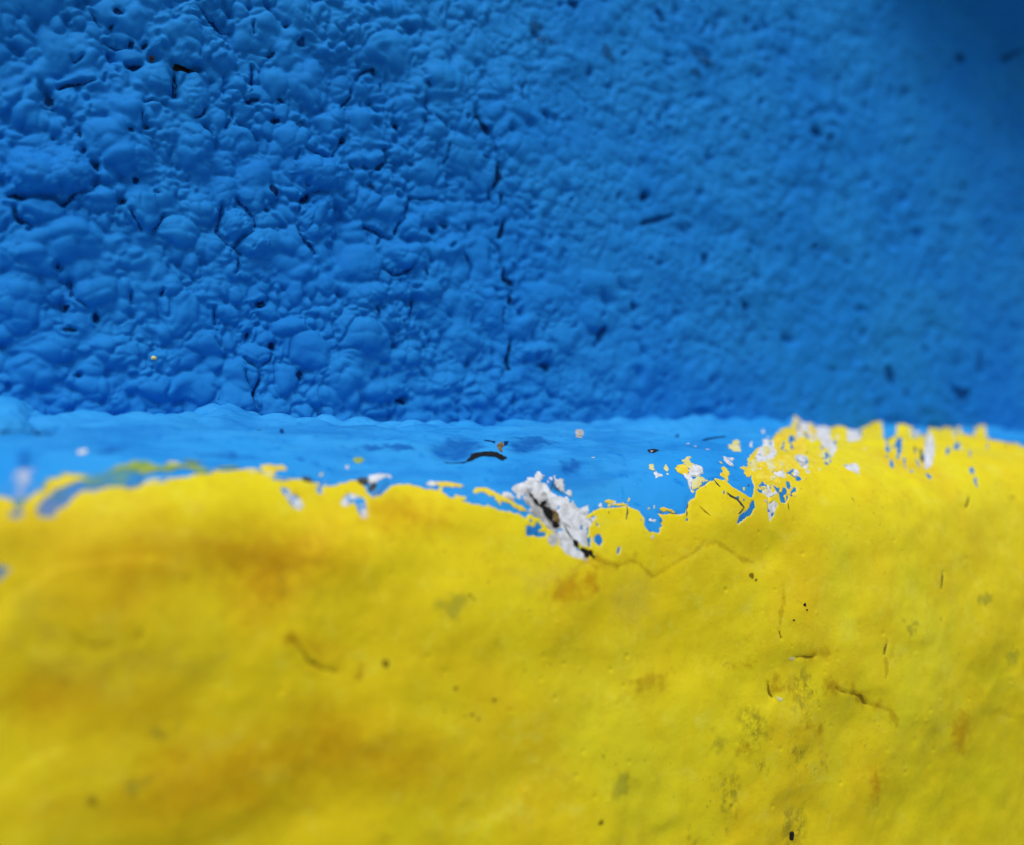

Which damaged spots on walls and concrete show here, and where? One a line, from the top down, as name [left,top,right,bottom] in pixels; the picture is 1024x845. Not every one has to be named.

peeling [260,464,287,477]
peeling [648,416,866,523]
peeling [885,426,978,487]
peeling [10,483,105,518]
peeling [286,491,303,510]
peeling [341,473,392,519]
spalling [426,471,630,561]